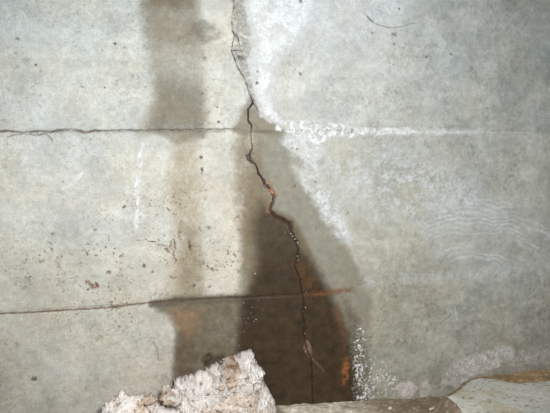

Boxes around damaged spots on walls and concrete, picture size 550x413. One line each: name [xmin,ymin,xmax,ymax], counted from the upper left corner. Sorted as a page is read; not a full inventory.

crack [0,306,122,314]
crack [246,84,313,397]
damp [145,0,477,406]